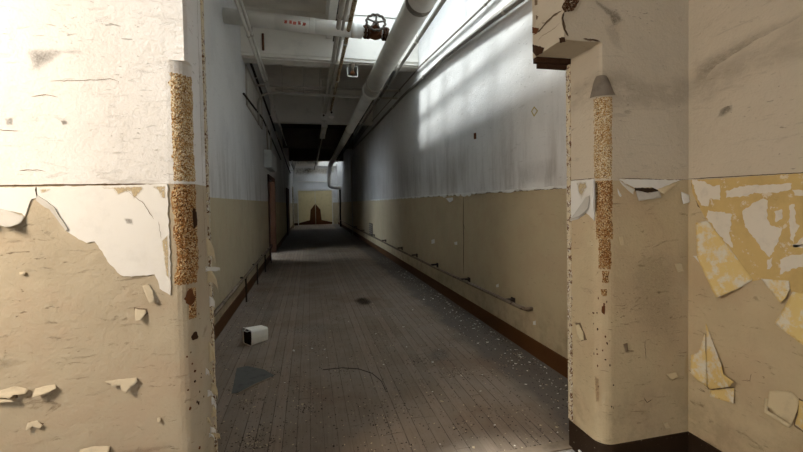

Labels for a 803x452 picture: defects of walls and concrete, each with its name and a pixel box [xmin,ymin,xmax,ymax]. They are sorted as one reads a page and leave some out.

crack [534,11,600,42]
peeling [0,72,220,321]
peeling [372,75,803,296]
crack [625,172,803,208]
peeling [0,384,56,403]